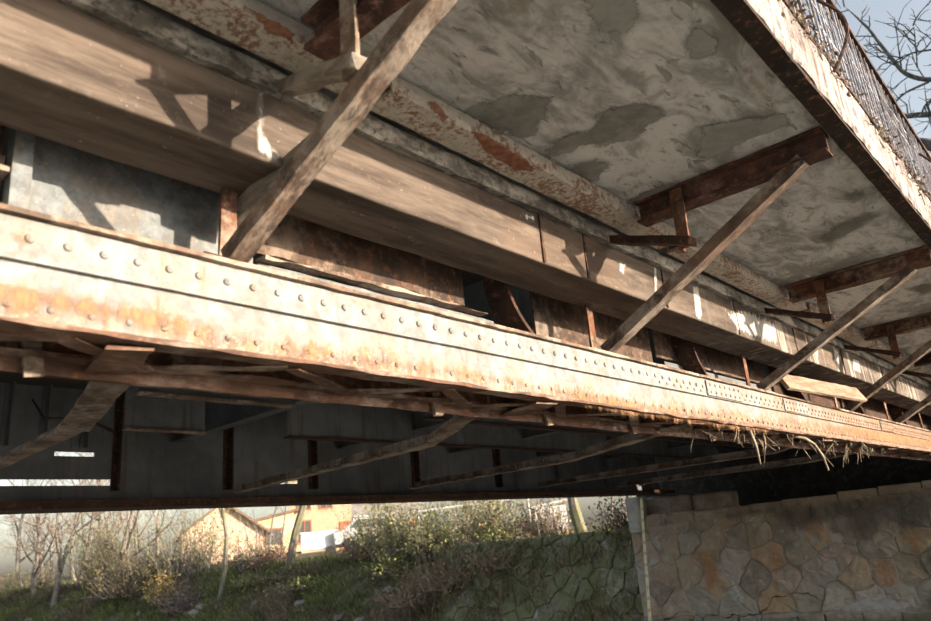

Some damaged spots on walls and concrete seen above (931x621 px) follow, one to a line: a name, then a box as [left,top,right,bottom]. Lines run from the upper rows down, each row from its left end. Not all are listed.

peeling [243,5,295,43]
corrosion [0,280,205,335]
corrosion [575,391,766,431]